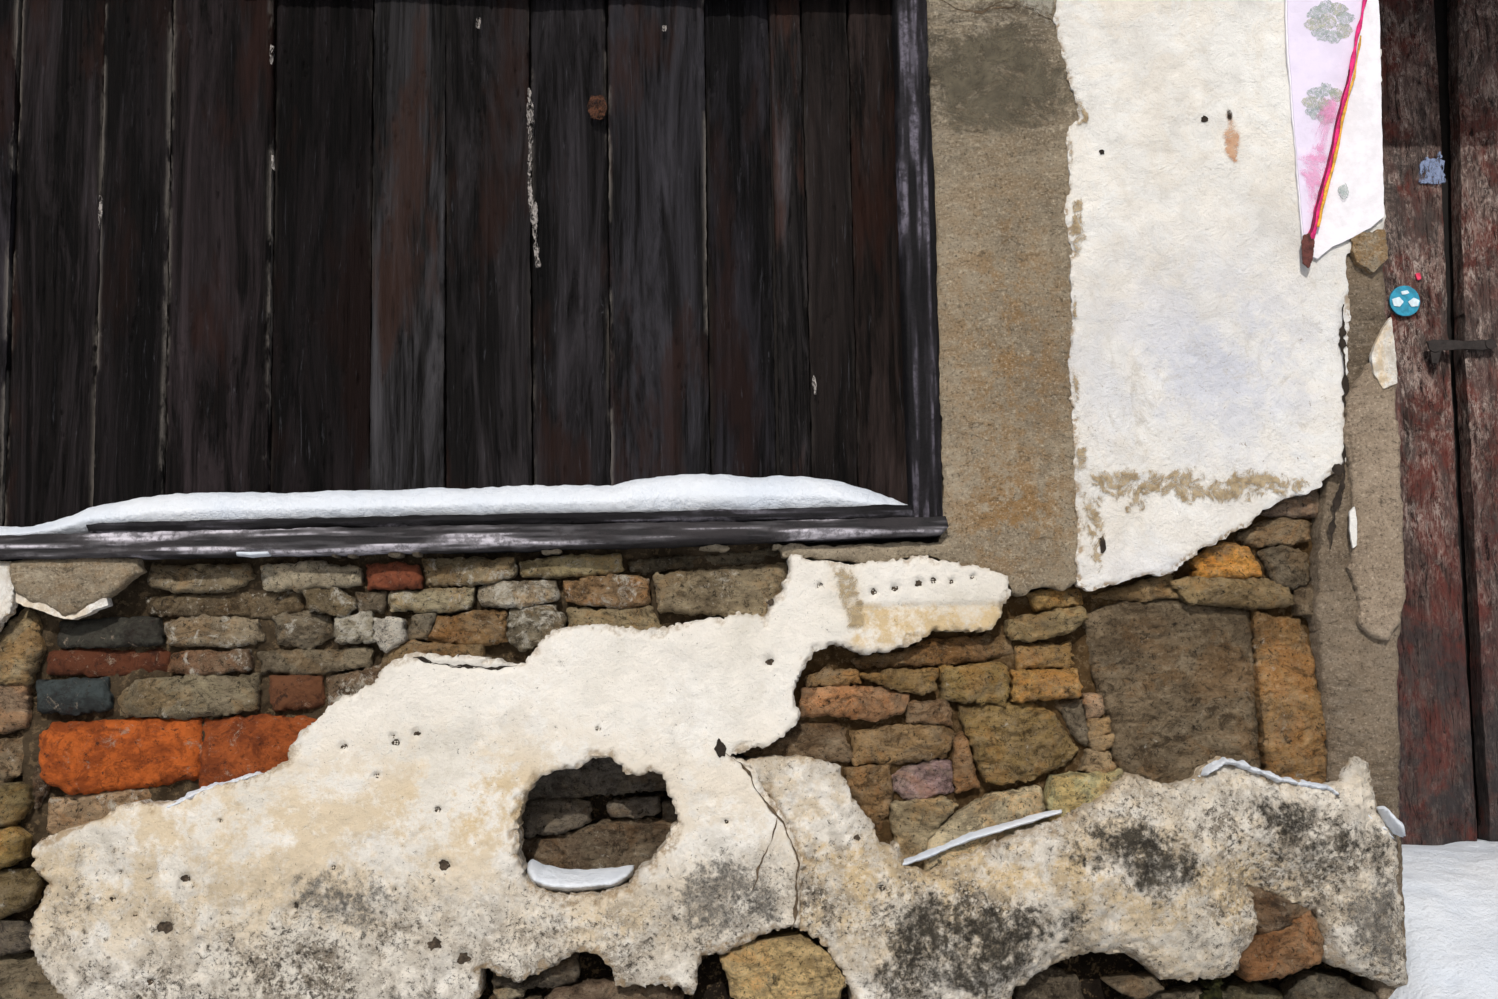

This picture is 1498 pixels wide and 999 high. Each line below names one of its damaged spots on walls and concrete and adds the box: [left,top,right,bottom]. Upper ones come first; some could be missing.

flaking render [1068,102,1089,160]
flaking render [1071,200,1086,255]
spalling [743,447,1328,871]
spalling [0,543,848,999]
crack [726,753,800,929]
water stain [1066,811,1214,908]
water stain [1249,787,1400,975]
water stain [864,887,1091,999]
spalling [1012,886,1377,999]